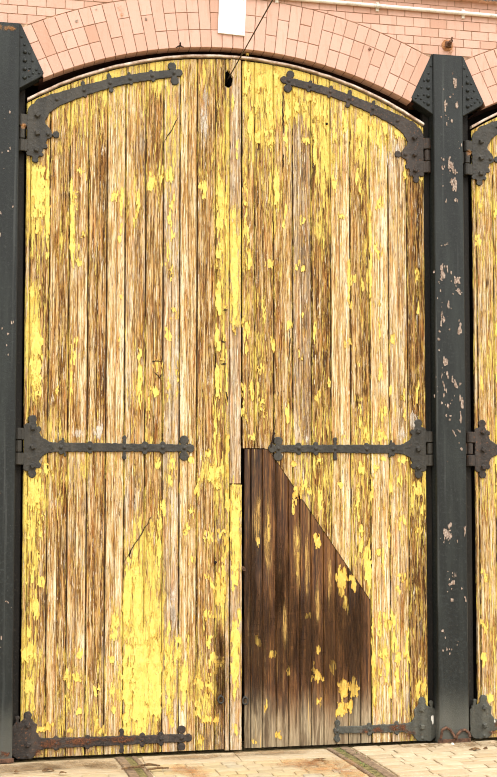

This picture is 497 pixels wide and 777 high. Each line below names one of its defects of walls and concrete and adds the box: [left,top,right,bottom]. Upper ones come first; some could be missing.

peeling [231,53,406,196]
peeling [31,154,51,260]
peeling [69,167,85,268]
peeling [29,314,44,400]
peeling [183,139,253,622]
peeling [433,264,464,451]
peeling [21,550,73,734]
rust [35,736,145,756]
peeling [93,536,242,736]
peeling [311,645,360,717]
peeling [335,455,427,709]
rust [362,724,415,737]